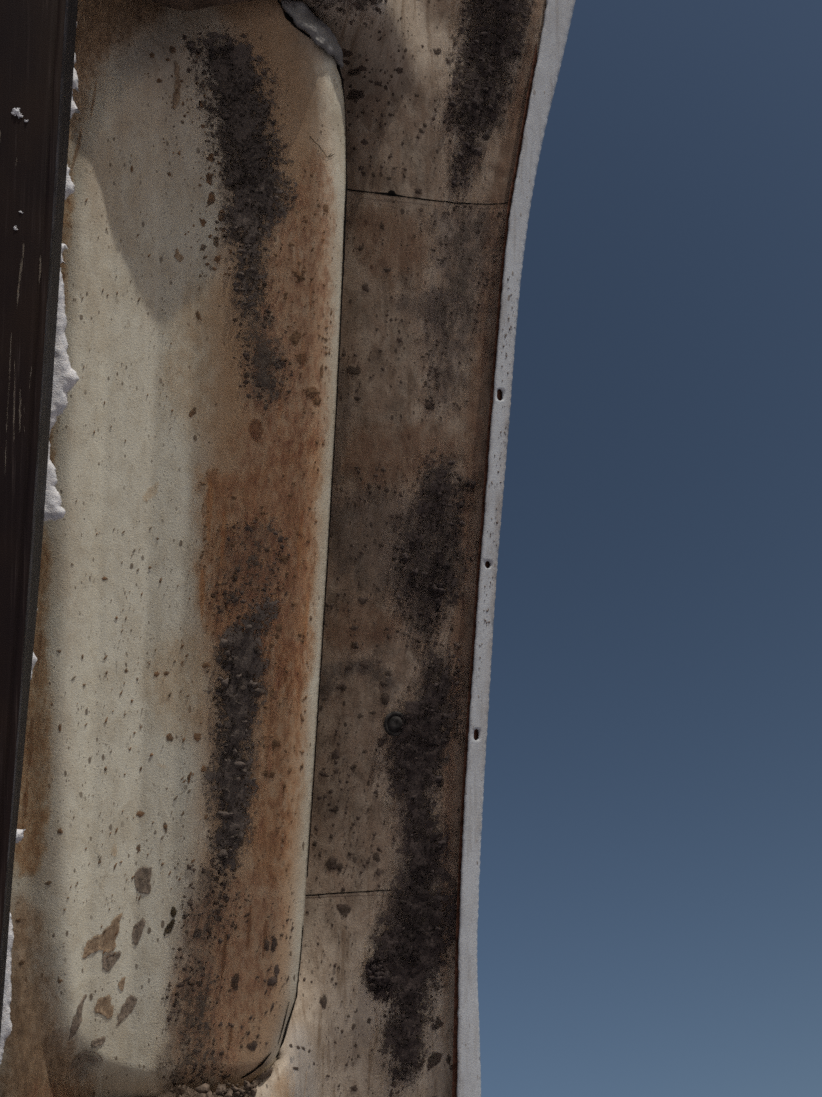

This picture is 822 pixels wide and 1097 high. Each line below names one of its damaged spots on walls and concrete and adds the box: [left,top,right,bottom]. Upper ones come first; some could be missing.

crack [305,64,508,899]
leakage [336,659,392,718]
crack [241,932,303,1079]